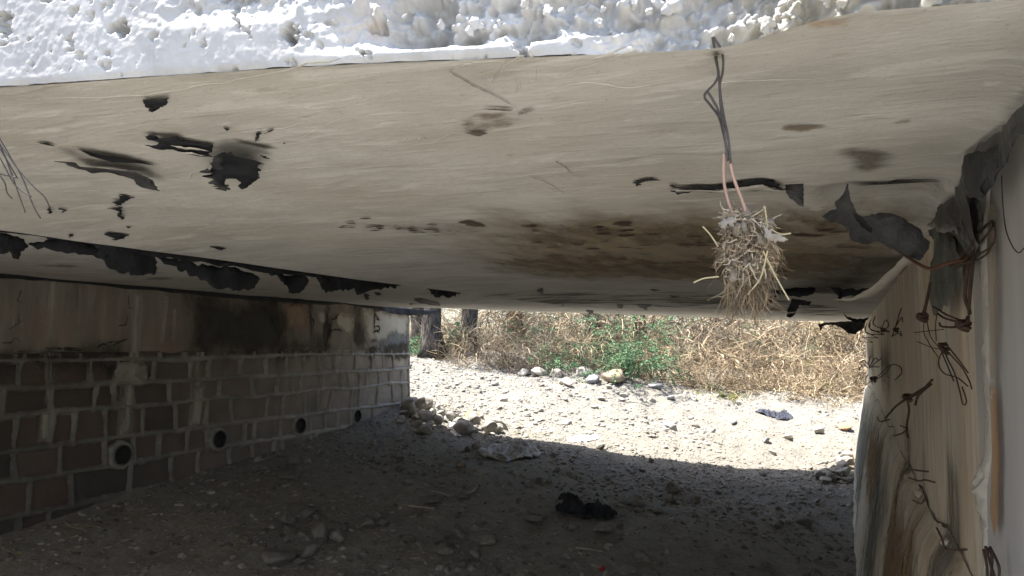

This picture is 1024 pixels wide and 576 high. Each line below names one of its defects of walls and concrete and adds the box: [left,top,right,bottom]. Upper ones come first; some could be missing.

peeling [143,98,168,112]
peeling [54,149,159,191]
peeling [145,129,274,191]
leakage [192,283,303,368]
corrosion [989,387,999,532]
corrosion [882,485,921,576]